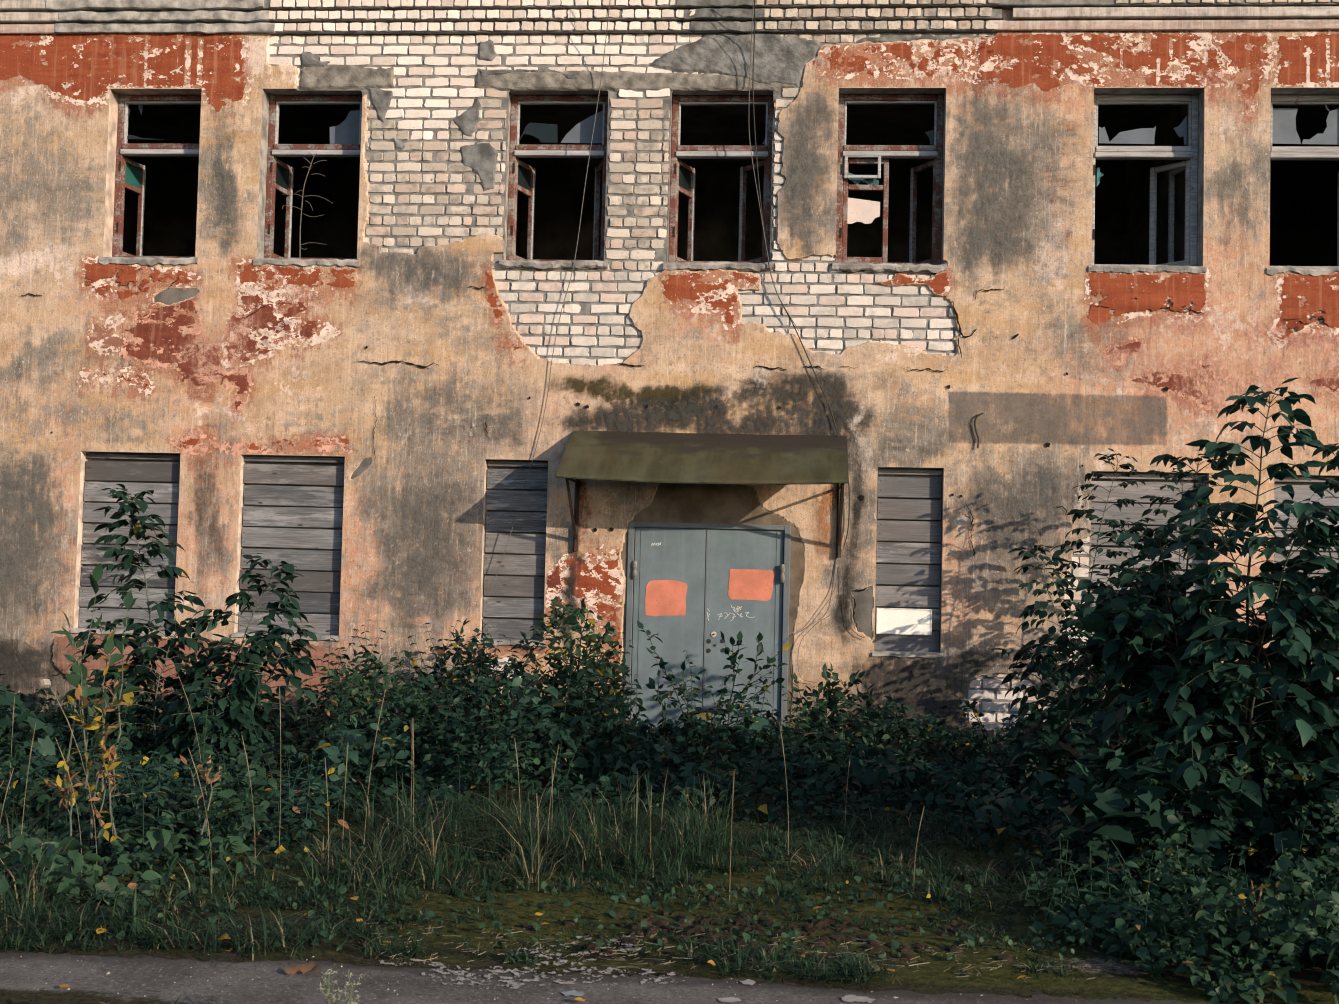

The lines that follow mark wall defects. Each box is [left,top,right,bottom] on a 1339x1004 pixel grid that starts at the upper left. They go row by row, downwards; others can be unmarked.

peeling [0,34,254,116]
spalling [267,0,1339,366]
damp [956,101,1032,274]
peeling [75,256,362,417]
damp [0,639,55,694]
damp [0,456,61,609]
damp [561,552,584,648]
spalling [545,483,804,725]
damp [564,368,881,640]
spalling [960,674,1059,730]